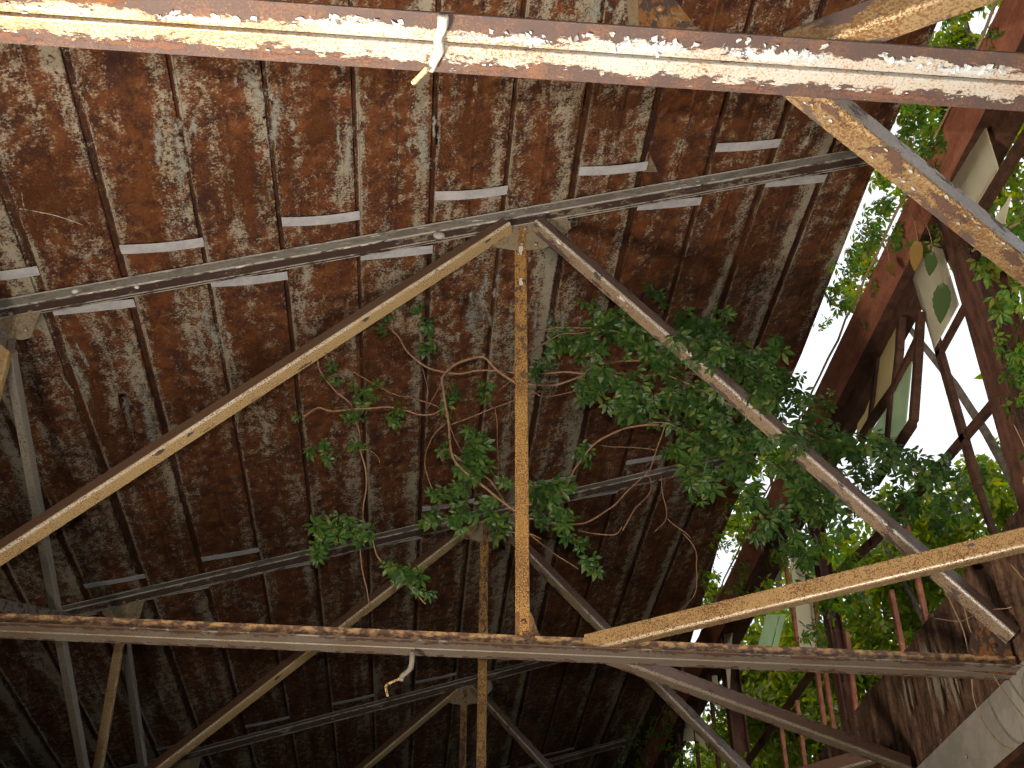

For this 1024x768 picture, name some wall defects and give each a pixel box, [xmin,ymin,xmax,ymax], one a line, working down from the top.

corrosion [62,32,187,51]
corrosion [242,49,381,64]
peeling [292,14,410,36]
corrosion [467,64,529,72]
peeling [457,0,700,58]
peeling [723,37,834,66]
peeling [879,52,1007,77]
corrosion [803,88,963,127]
corrosion [858,145,920,191]
corrosion [929,190,980,228]
corrosion [996,242,1024,272]
corrosion [67,366,139,463]